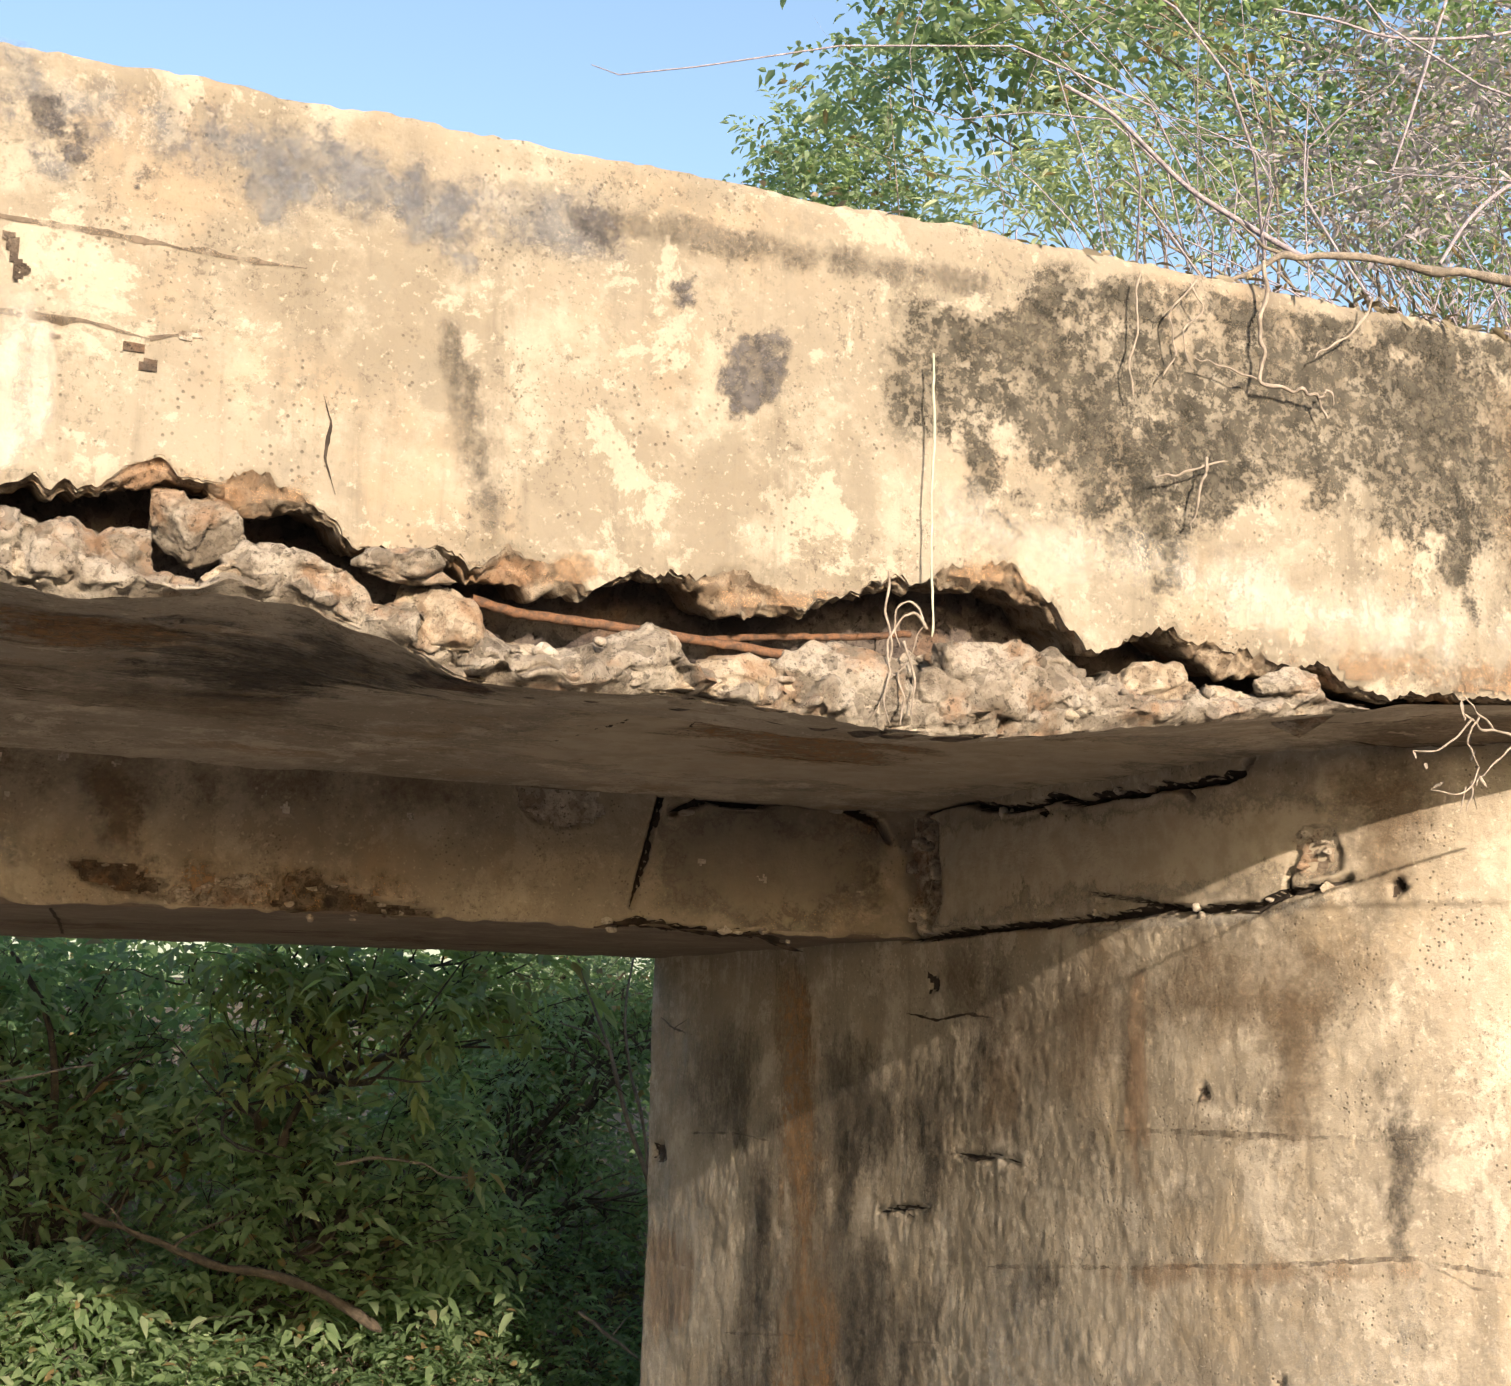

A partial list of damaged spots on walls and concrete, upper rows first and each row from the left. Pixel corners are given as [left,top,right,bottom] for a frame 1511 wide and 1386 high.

leakage [884,265,1511,654]
spalling [0,454,1509,742]
corrosion [723,590,832,608]
spalling [69,859,433,923]
crack [601,797,803,952]
crack [807,808,884,840]
crack [923,764,1254,823]
crack [915,876,1354,942]
leakage [1155,947,1330,1135]
leakage [678,1028,781,1386]
leakage [810,978,1022,1386]
leakage [1389,1102,1426,1258]